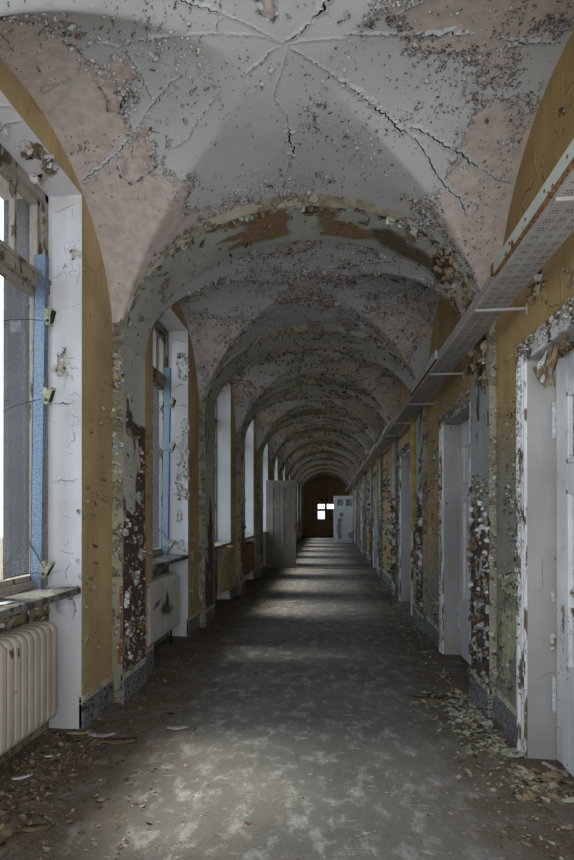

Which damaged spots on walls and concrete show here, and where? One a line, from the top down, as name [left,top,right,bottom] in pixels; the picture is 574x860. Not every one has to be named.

crack [51,236,87,310]
peeling [0,0,573,671]
crack [80,0,560,226]
peeling [466,296,574,703]